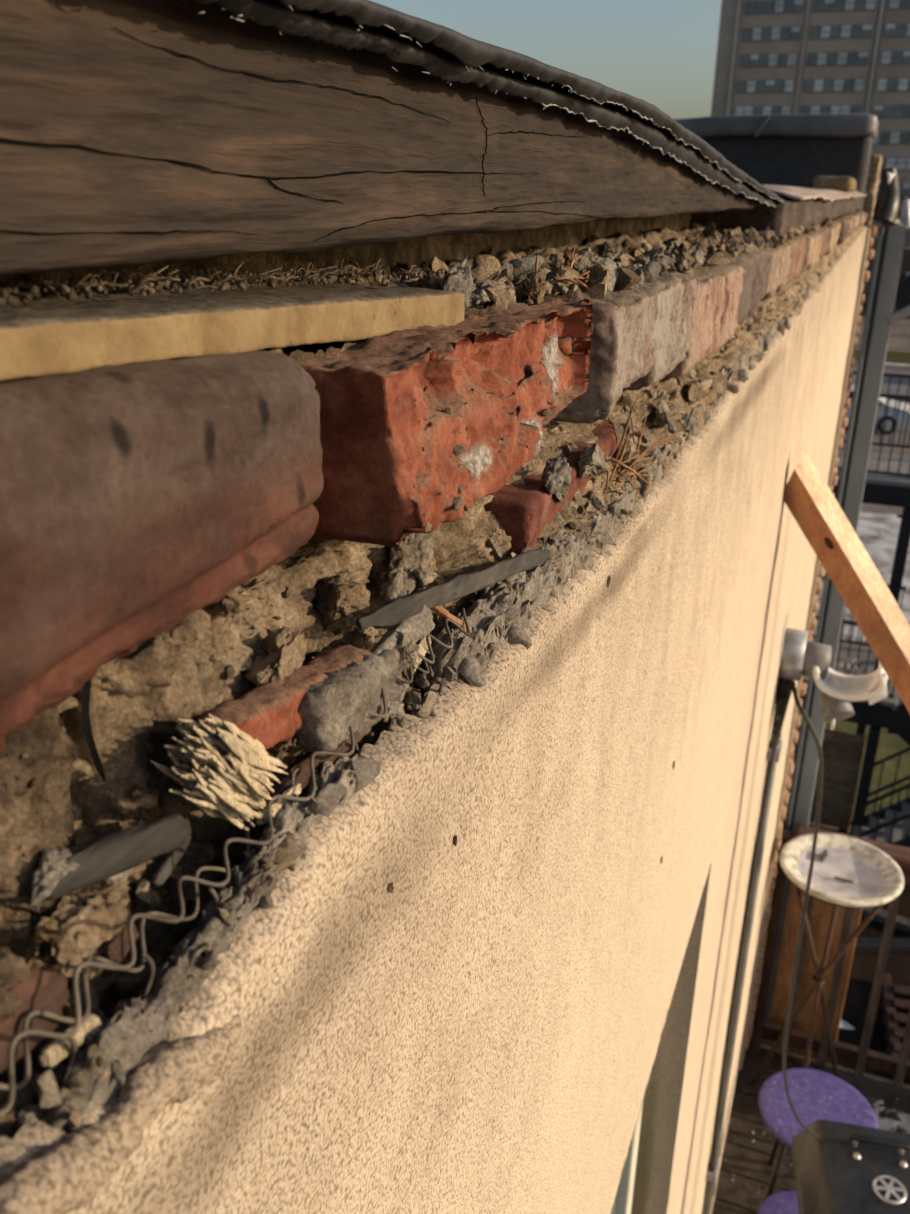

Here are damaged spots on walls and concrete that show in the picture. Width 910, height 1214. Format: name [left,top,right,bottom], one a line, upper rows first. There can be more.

crack [111,27,450,123]
crack [0,97,626,241]
spalling [726,304,803,394]
spalling [508,622,532,650]
spalling [458,654,486,687]
spalling [414,691,438,720]
spalling [313,758,381,817]